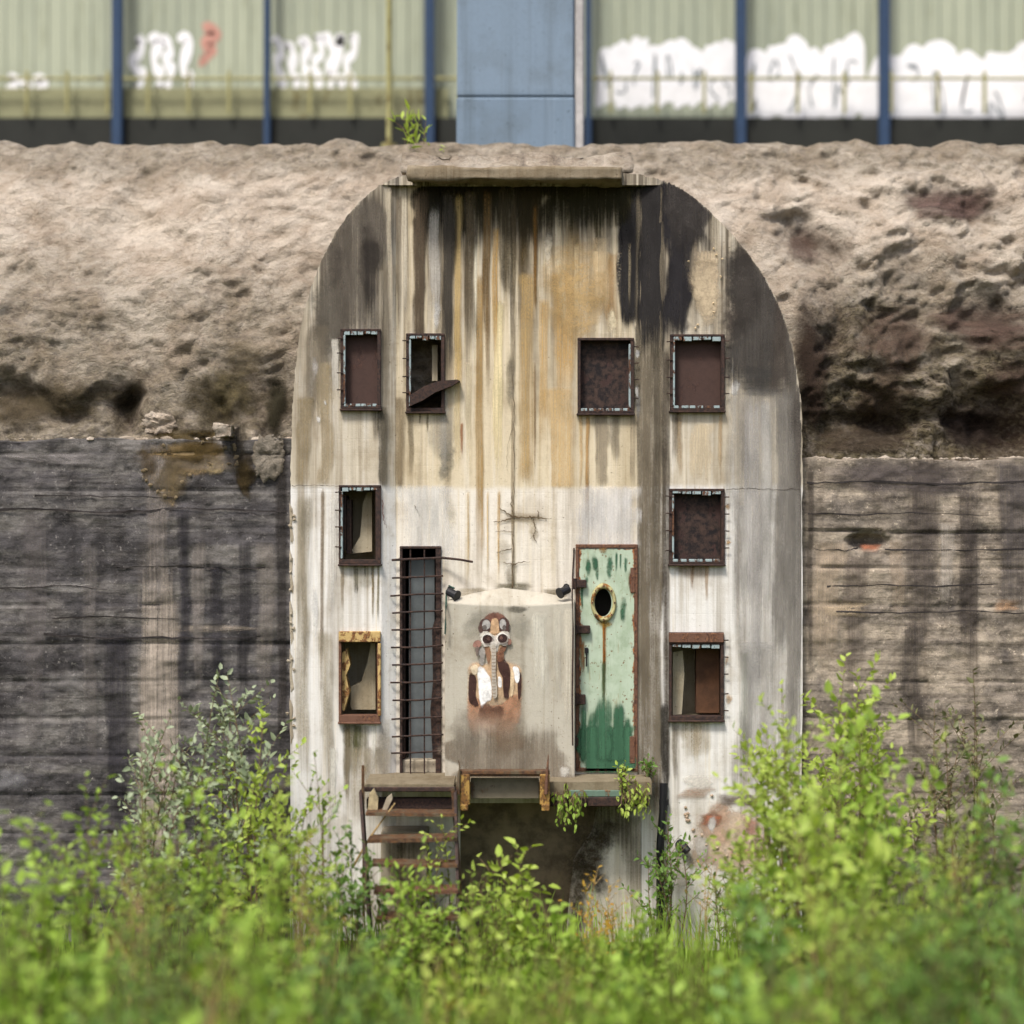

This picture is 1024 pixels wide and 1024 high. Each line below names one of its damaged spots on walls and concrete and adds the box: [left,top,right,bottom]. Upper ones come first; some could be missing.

water stain [14,454,79,463]
spalling [141,434,285,506]
water stain [140,181,712,848]
corrosion [454,199,462,376]
corrosion [467,231,500,561]
crack [495,341,552,588]
corrosion [521,205,548,473]
peeling [581,488,638,606]
water stain [838,463,978,733]
water stain [1000,464,1024,591]
water stain [105,635,127,815]
peeling [575,699,636,773]